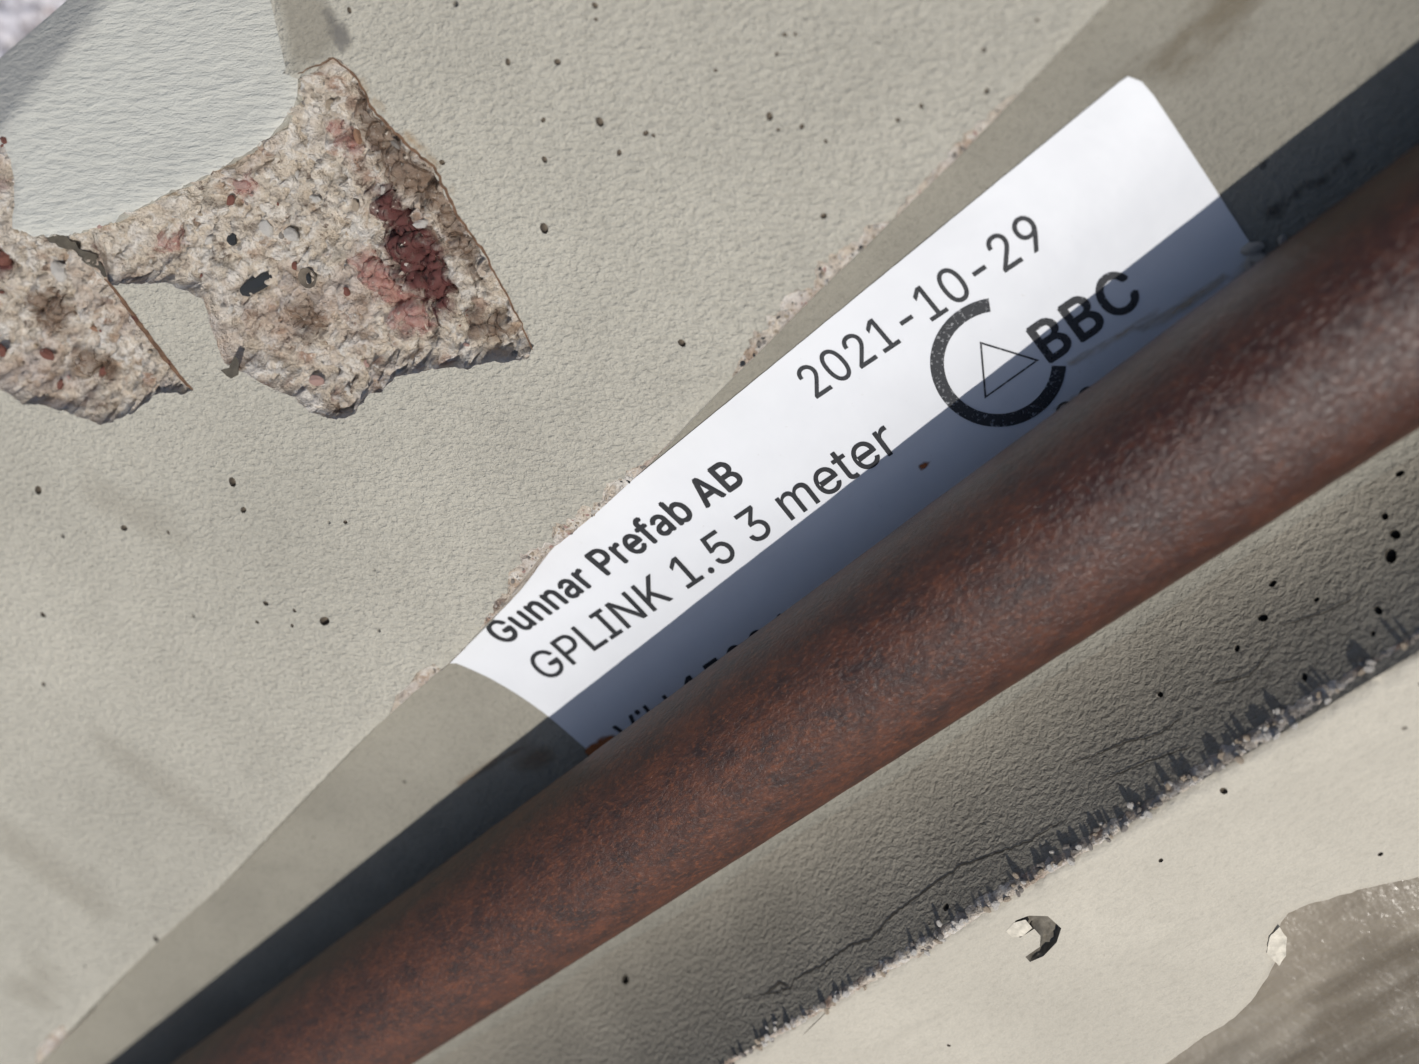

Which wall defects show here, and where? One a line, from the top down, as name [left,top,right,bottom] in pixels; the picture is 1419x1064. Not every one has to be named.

spalling [0,57,534,425]
corrosion [335,89,472,329]
corrosion [27,293,72,330]
corrosion [78,351,112,380]
corrosion [467,312,504,339]
crack [1213,592,1364,685]
corrosion [585,735,615,756]
crack [1069,717,1190,781]
spalling [724,630,1419,1064]
crack [745,821,1063,999]